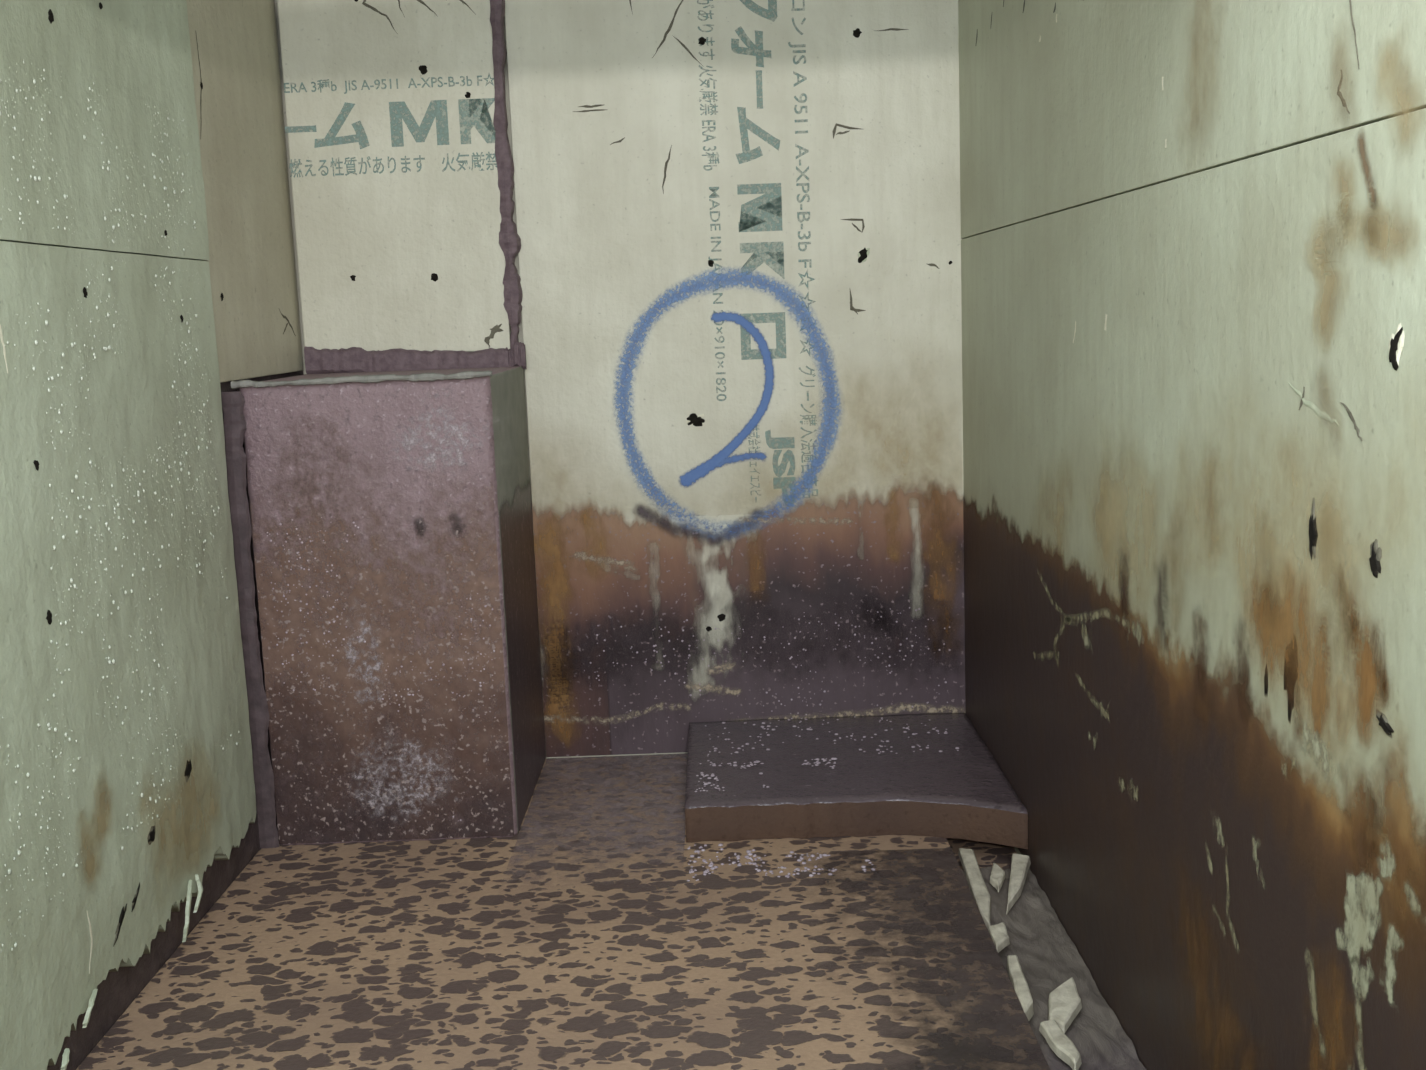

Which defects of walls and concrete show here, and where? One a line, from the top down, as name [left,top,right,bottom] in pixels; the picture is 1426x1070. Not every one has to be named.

damp [1358,135,1404,251]
corrosion [1252,582,1329,737]
corrosion [1348,605,1387,737]
damp [252,476,1426,1070]
peeling [61,1048,70,1070]
peeling [82,989,98,1028]
spalling [113,883,140,947]
peeling [182,874,203,942]
peeling [1305,954,1325,1054]
peeling [1336,845,1426,1070]